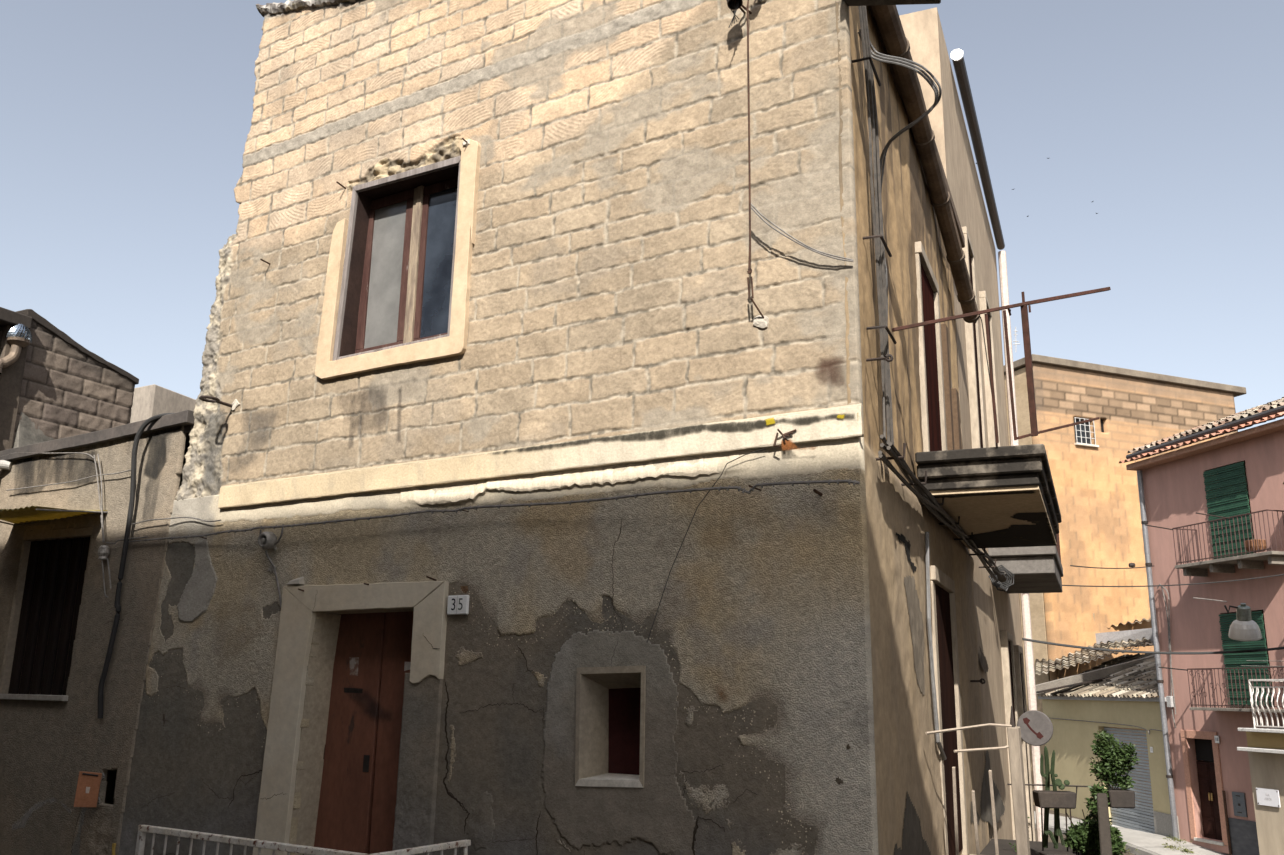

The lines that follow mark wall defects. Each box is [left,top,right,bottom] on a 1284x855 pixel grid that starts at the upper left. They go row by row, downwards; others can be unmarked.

peeling [118,541,267,855]
peeling [262,599,281,619]
crack [443,646,544,855]
peeling [433,582,822,855]
crack [681,764,757,855]